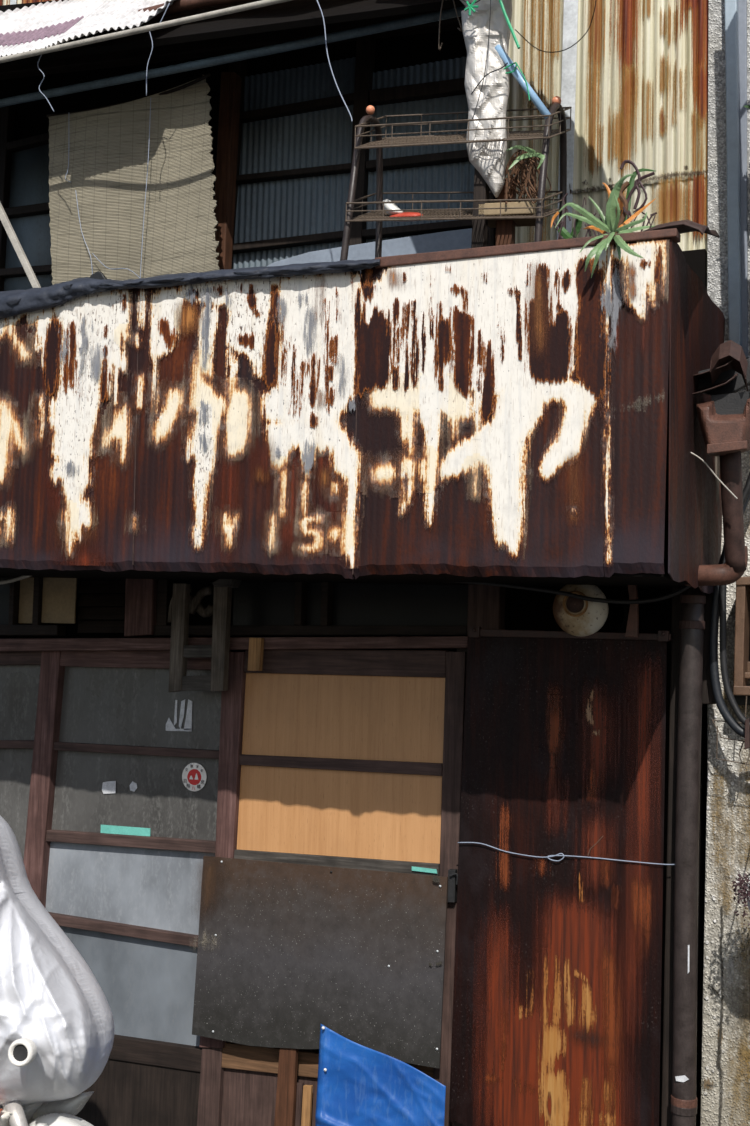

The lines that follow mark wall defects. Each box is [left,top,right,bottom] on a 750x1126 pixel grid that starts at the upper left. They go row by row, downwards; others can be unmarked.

corrosion [523,0,709,242]
corrosion [47,459,79,533]
corrosion [42,315,111,403]
corrosion [70,527,105,566]
peeling [0,239,669,569]
corrosion [158,245,663,548]
corrosion [449,627,672,1126]
damp [711,765,750,925]
damp [729,930,750,1125]